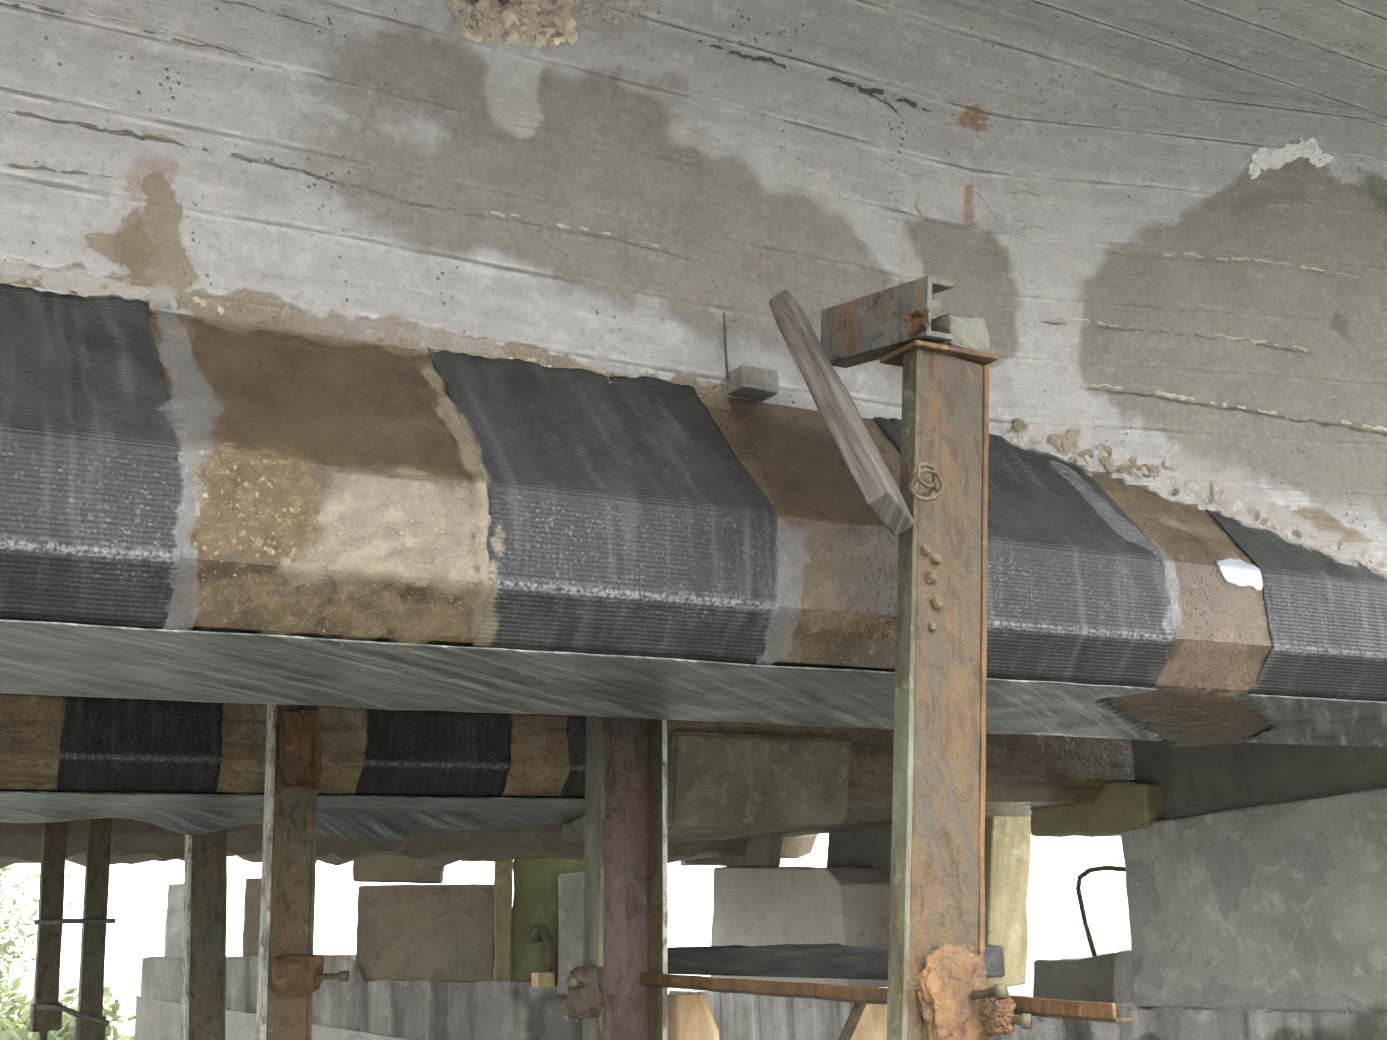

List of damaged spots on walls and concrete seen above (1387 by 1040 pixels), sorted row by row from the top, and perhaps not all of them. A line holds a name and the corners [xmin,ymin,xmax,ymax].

spalling [448,0,646,47]
crack [698,40,786,69]
crack [828,77,955,121]
damp [85,176,198,301]
damp [344,32,1017,366]
damp [1081,137,1387,508]